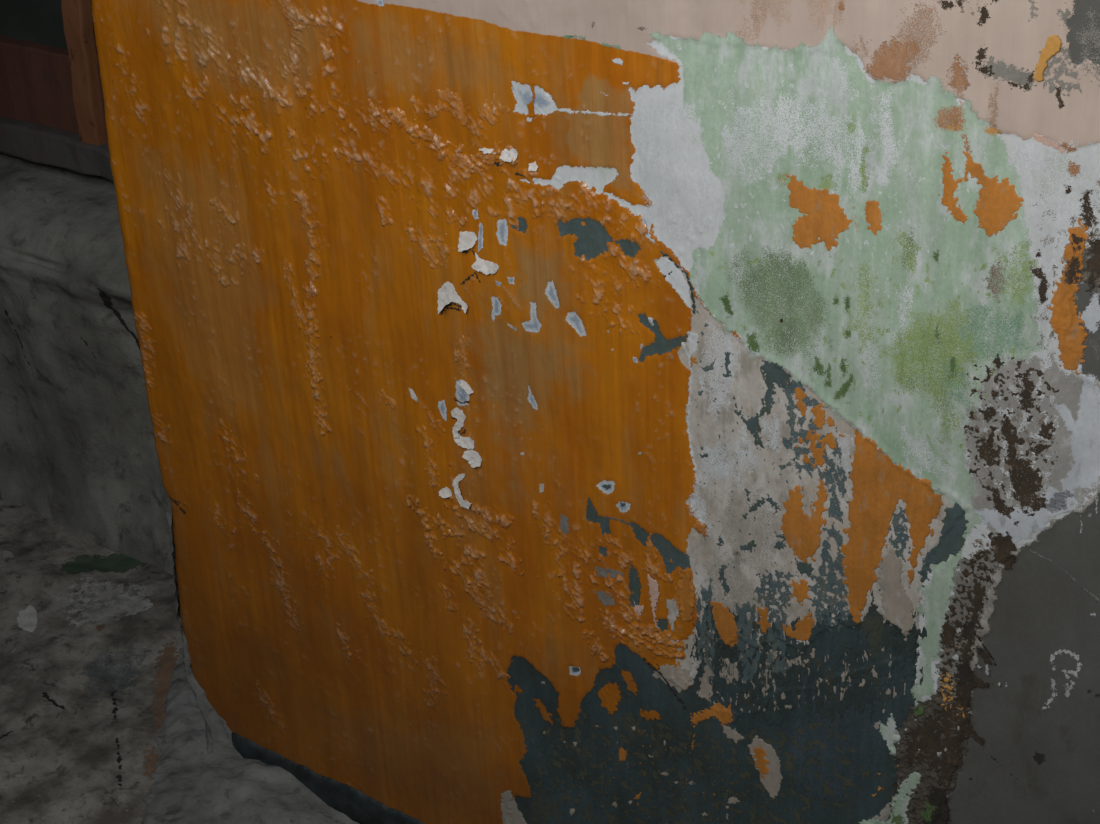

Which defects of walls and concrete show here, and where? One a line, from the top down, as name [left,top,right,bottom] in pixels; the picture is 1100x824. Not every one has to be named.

flaking render [1063,0,1100,87]
crack [98,288,141,353]
peeling [437,209,542,333]
leakage [719,245,852,365]
peeling [479,27,1100,824]
crack [42,692,65,709]
crack [110,691,122,786]